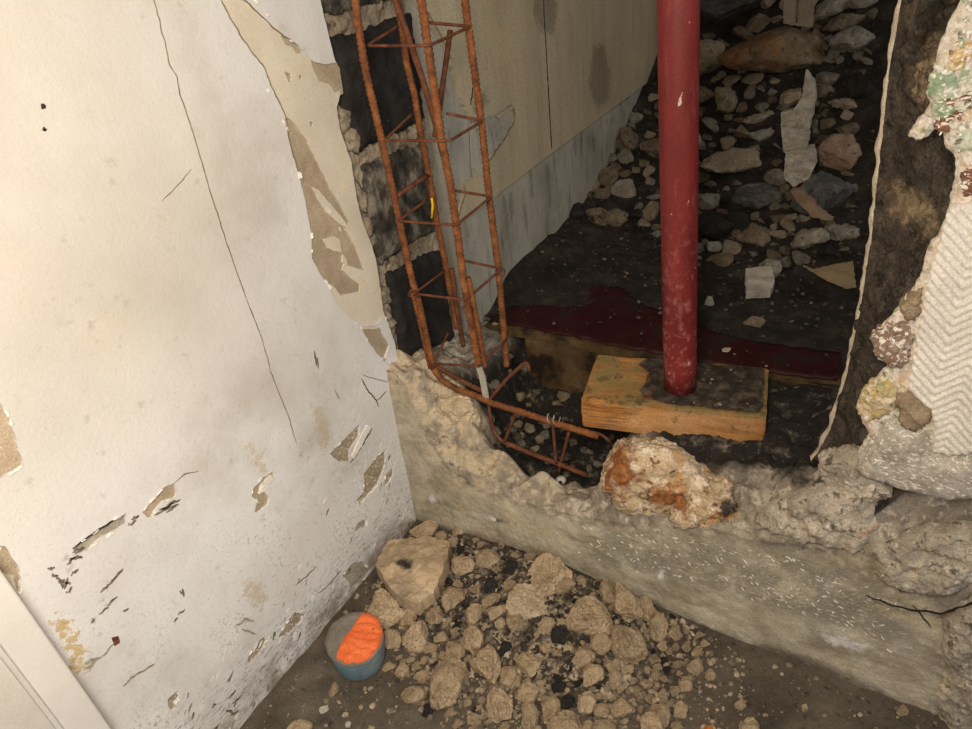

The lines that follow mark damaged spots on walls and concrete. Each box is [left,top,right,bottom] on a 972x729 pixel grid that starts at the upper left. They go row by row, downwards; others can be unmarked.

peeling [927,0,972,197]
crack [153,0,297,444]
peeling [221,0,389,361]
spalling [351,0,624,484]
spalling [0,405,23,476]
spalling [66,471,198,565]
spalling [252,473,274,512]
rust [604,443,645,498]
rust [647,492,686,512]
spalling [753,444,893,555]
spalling [0,546,23,595]
crack [865,595,972,628]